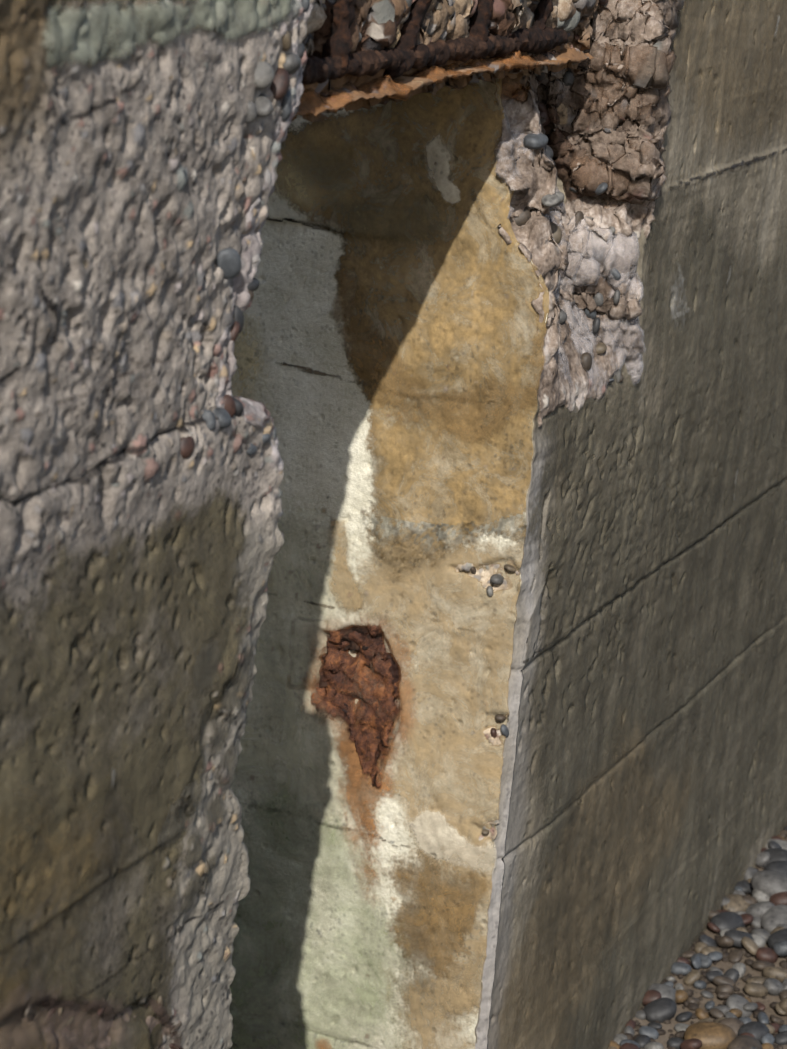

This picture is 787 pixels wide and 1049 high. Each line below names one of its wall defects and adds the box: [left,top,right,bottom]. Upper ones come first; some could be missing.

damp [0,0,47,111]
spalling [201,0,685,473]
crack [670,148,787,190]
crack [0,416,219,514]
spalling [180,436,195,459]
damp [275,79,787,1049]
damp [0,489,252,1049]
corrosion [337,710,402,877]